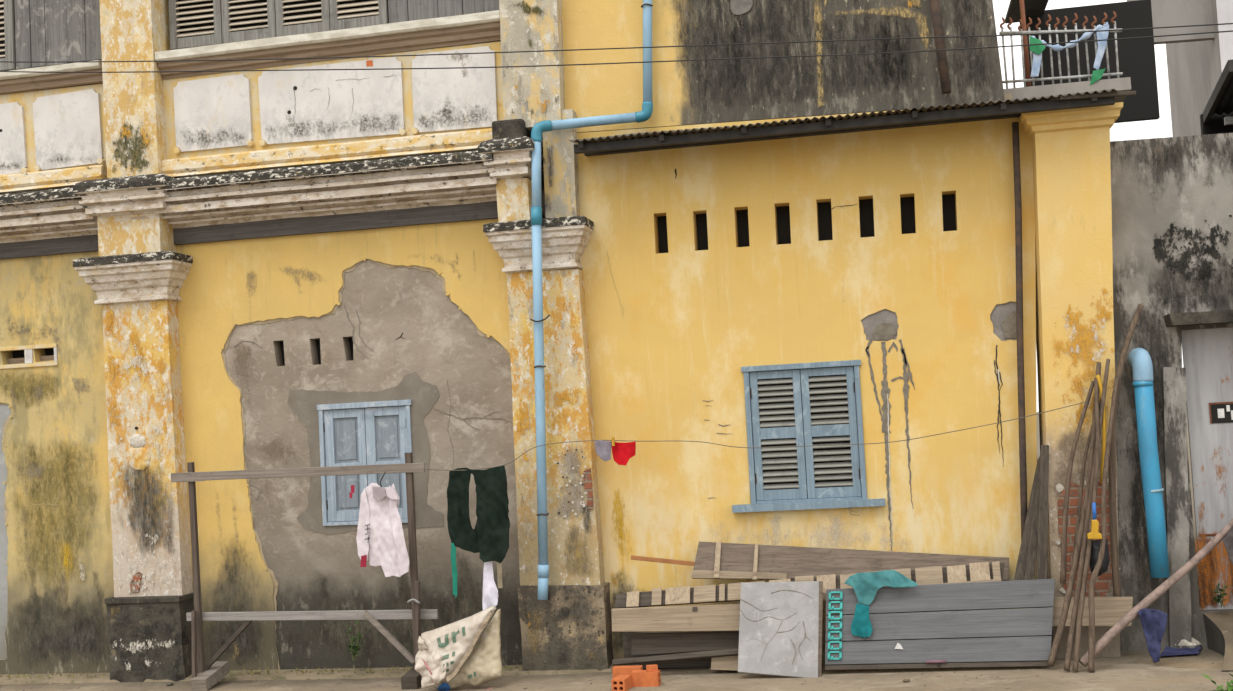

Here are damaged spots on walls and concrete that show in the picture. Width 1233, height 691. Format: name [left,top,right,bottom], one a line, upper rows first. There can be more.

water stain [421,106,477,127]
water stain [679,0,929,110]
flaking render [0,403,12,660]
water stain [18,531,109,666]
peeling [104,310,166,459]
flaking render [128,572,147,594]
peeling [113,638,175,670]
flaking render [221,258,531,670]
flaking render [1054,288,1120,597]
water stain [1131,420,1160,609]
water stain [1135,215,1233,460]
rust [1195,504,1233,610]